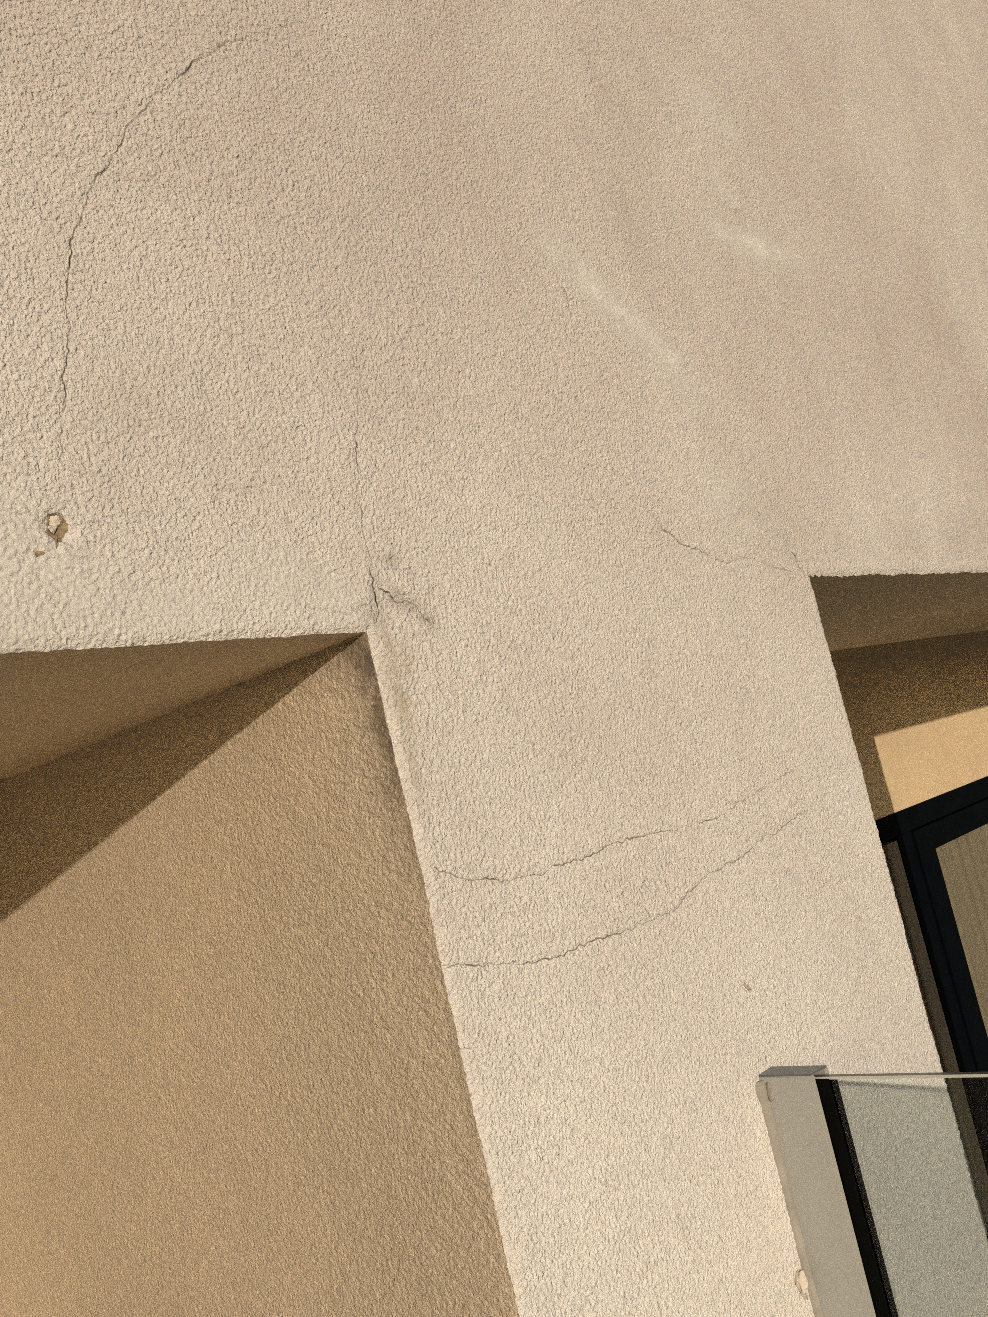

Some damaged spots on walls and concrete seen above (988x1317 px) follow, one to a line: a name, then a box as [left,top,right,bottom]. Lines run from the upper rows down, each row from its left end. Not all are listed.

crack [61,101,151,433]
crack [369,562,428,622]
crack [526,933,621,963]